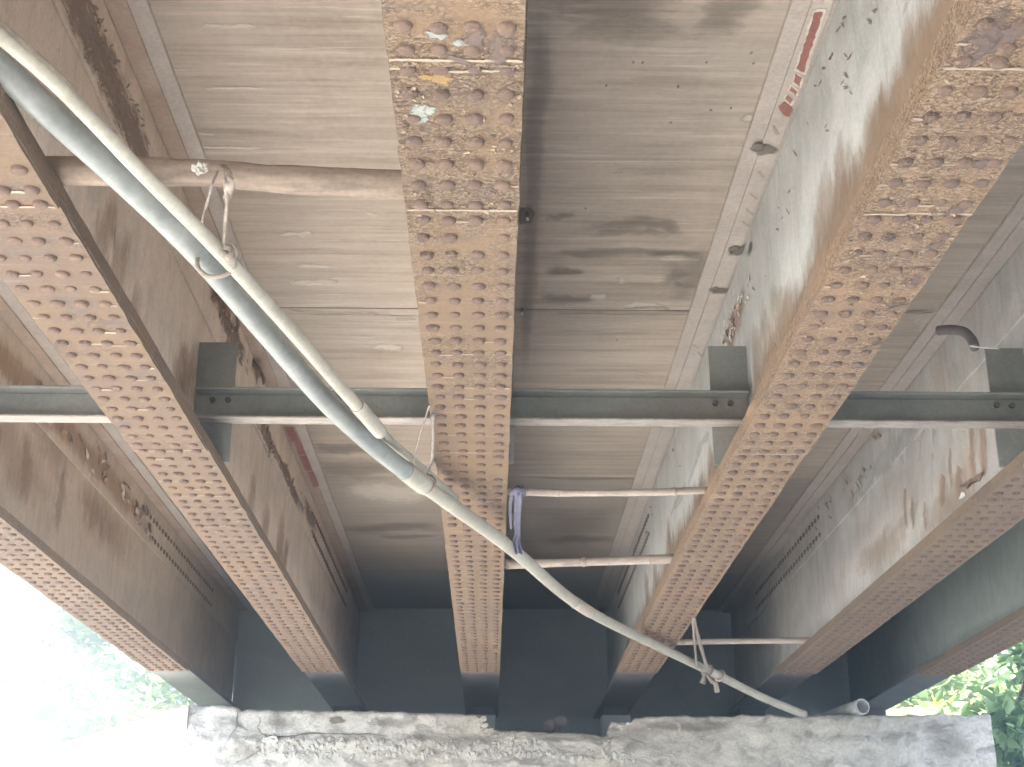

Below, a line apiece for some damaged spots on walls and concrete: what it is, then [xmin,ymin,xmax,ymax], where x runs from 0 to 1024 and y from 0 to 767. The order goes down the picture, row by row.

peeling [778,0,851,117]
peeling [47,423,154,542]